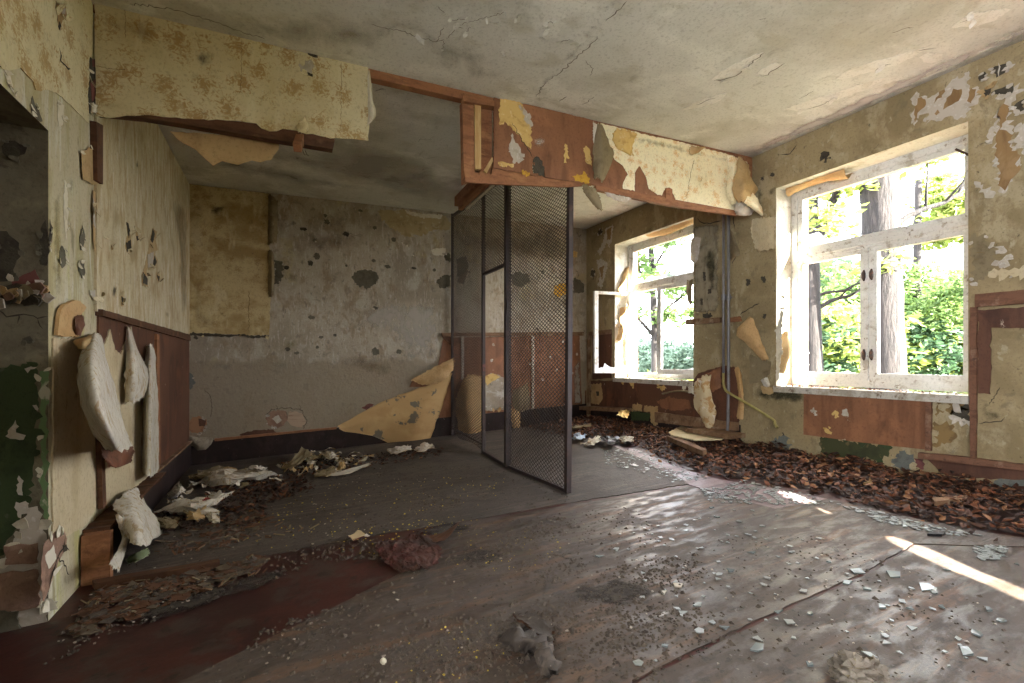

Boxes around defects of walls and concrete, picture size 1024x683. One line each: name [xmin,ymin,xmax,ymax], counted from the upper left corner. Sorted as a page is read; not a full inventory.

crack [538,1,627,104]
peeling [712,52,784,83]
peeling [964,61,1024,166]
peeling [80,145,96,185]
spalling [498,139,545,177]
peeling [968,235,1013,268]
peeling [274,260,289,284]
peeling [345,259,391,290]
peeling [932,403,970,443]
peeling [0,362,67,633]